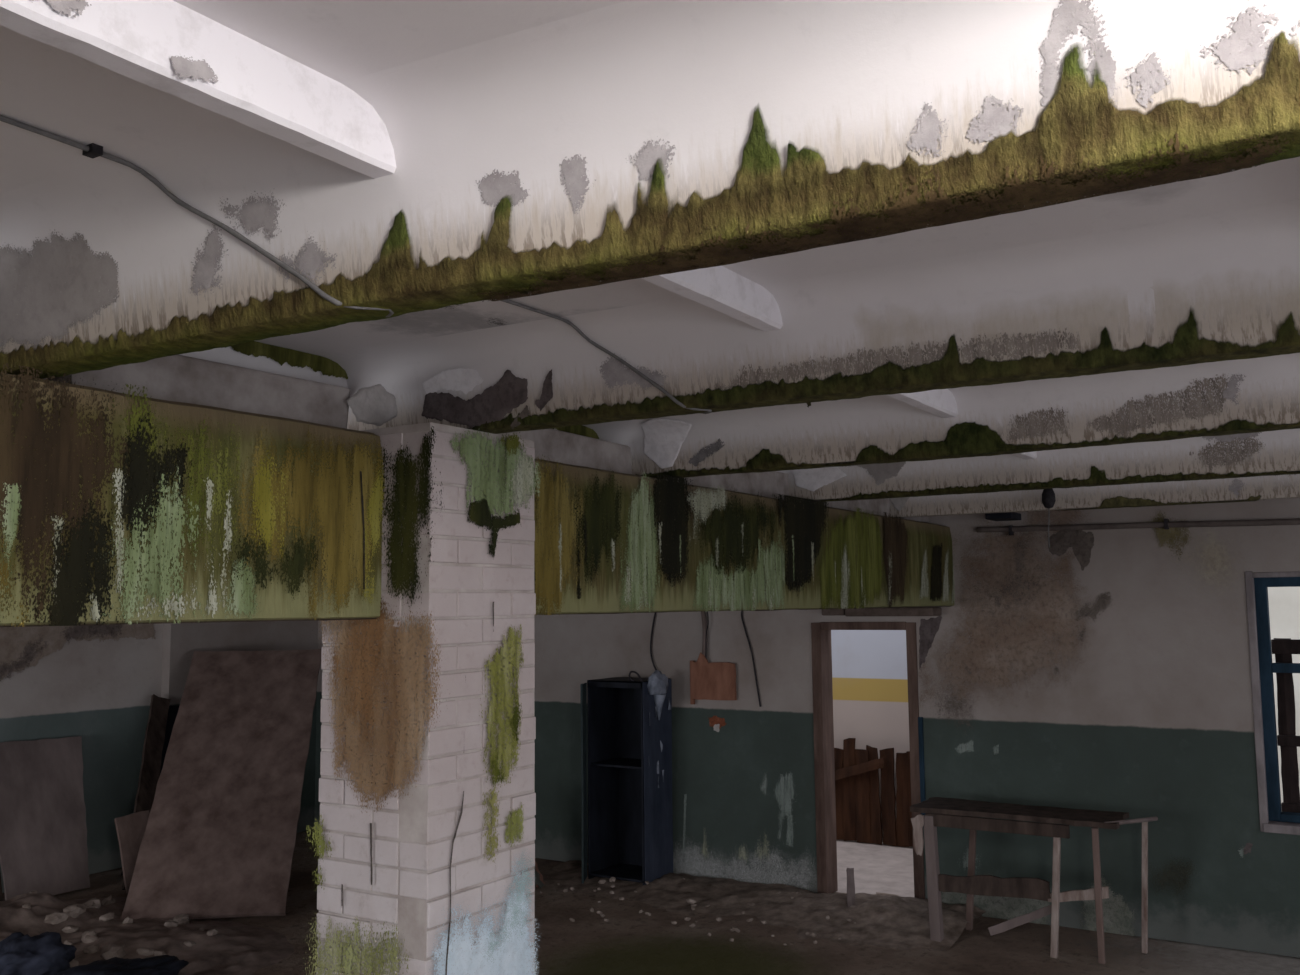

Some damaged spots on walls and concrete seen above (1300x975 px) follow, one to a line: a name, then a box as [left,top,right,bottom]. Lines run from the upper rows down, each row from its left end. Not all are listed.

leakage [1069,175,1222,213]
peeling [0,229,119,349]
peeling [190,191,285,297]
peeling [276,237,337,286]
leakage [838,277,1131,369]
leakage [1150,257,1300,348]
leakage [0,363,289,627]
leakage [618,438,829,613]
spalling [1049,530,1094,571]
peeling [0,624,156,681]
leakage [883,510,1094,733]
leakage [504,801,524,847]